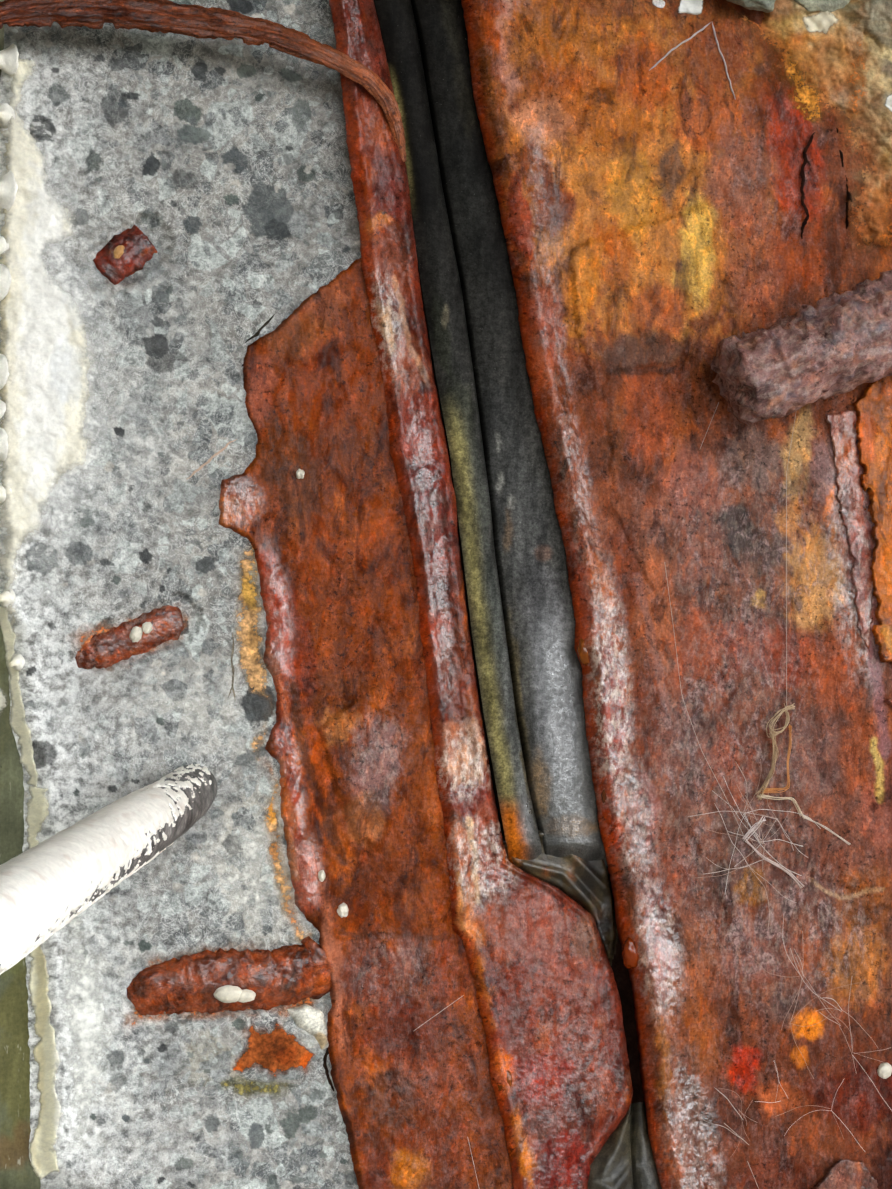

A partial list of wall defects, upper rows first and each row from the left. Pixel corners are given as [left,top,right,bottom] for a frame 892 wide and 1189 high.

corrosion [0,0,406,162]
corrosion [787,56,820,121]
corrosion [93,225,157,285]
crack [800,128,853,239]
water stain [0,44,108,849]
corrosion [711,270,892,663]
corrosion [75,605,184,670]
corrosion [237,548,268,697]
corrosion [126,785,334,1096]
water stain [29,917,110,1179]
corrosion [812,1159,878,1189]